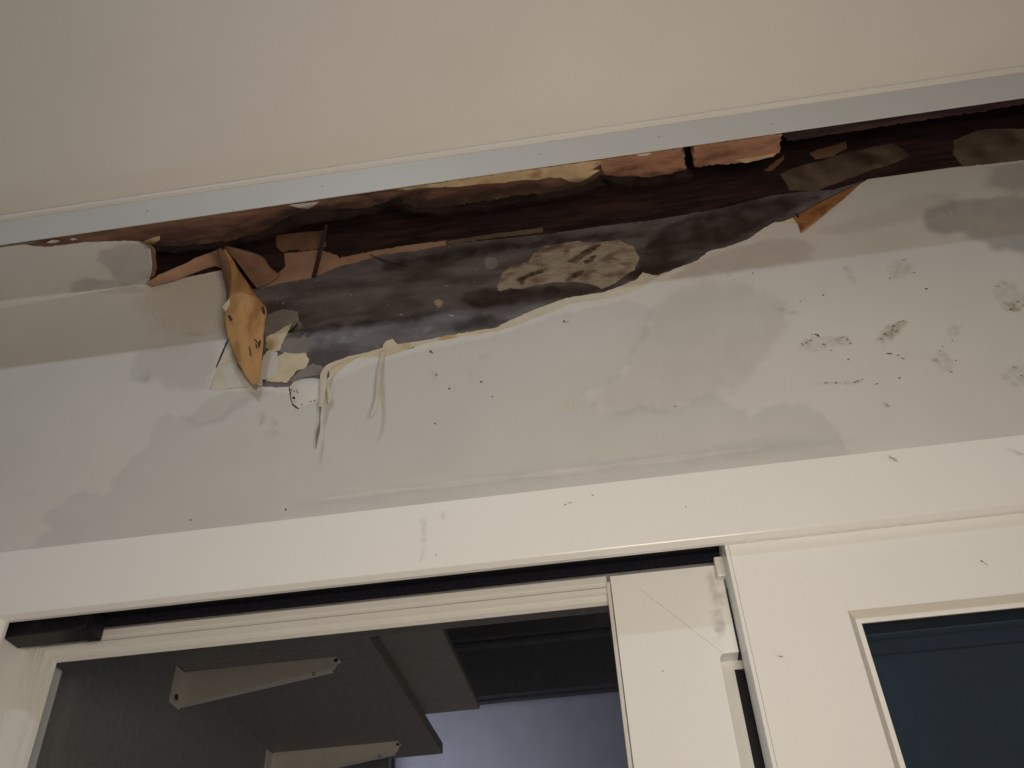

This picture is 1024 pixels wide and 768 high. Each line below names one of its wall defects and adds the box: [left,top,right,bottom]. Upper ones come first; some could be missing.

peeling [234,142,910,389]
peeling [953,129,1024,166]